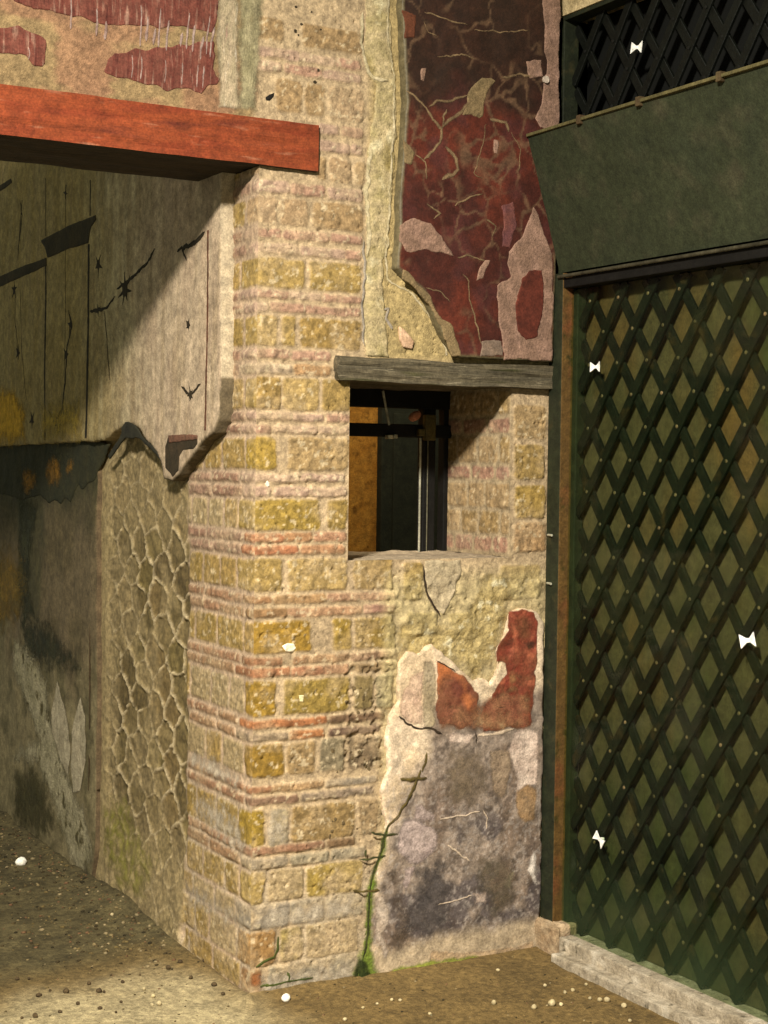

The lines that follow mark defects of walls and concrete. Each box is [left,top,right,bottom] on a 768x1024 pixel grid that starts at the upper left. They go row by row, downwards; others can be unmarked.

crack [424,12,528,58]
crack [502,72,530,80]
crack [407,91,521,219]
peeling [391,0,561,363]
crack [48,231,205,422]
crack [427,254,485,342]
spalling [108,422,198,477]
crack [423,566,440,615]
peeling [366,574,544,973]
crack [353,716,442,977]